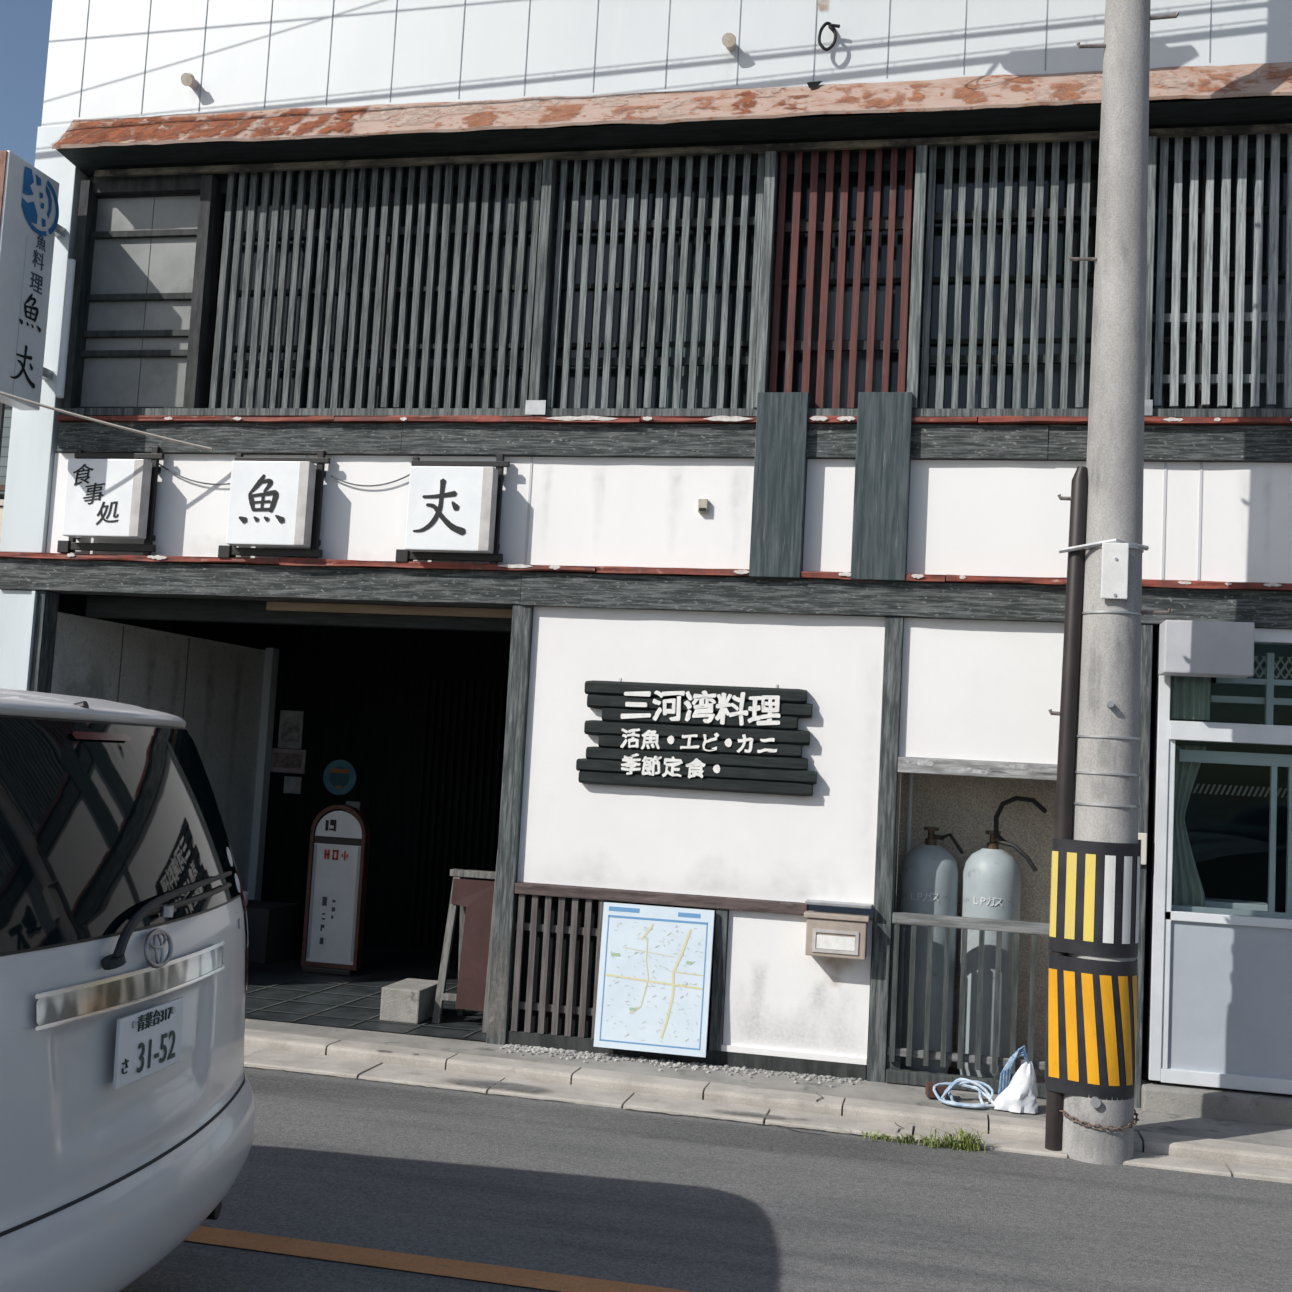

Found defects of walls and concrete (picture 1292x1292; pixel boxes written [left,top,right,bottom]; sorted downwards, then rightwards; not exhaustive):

rust [732,91,758,114]
rust [837,83,928,107]
rust [954,85,987,103]
rust [1004,77,1034,91]
rust [1052,83,1083,100]
rust [1191,71,1235,91]
rust [53,107,367,145]
rust [462,111,504,127]
rust [539,104,584,122]
rust [604,105,658,119]